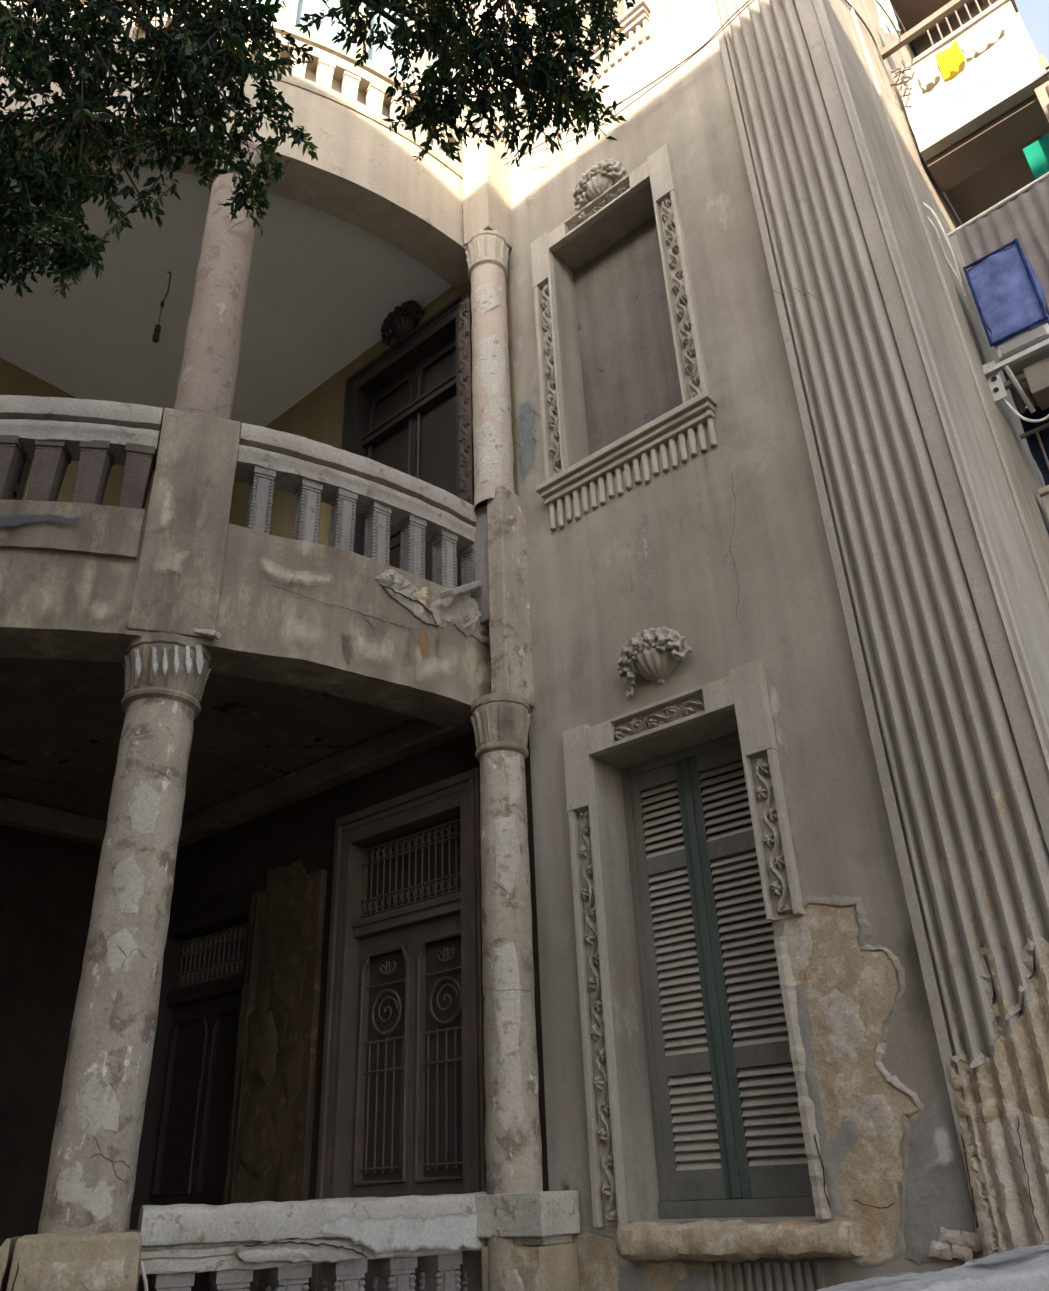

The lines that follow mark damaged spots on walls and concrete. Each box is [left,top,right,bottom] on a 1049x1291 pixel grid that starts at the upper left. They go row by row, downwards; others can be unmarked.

peeling [128,726,182,834]
spalling [994,789,1011,815]
peeling [107,854,146,973]
peeling [76,1075,120,1136]
peeling [773,895,924,1268]
peeling [925,856,1049,1262]
crack [88,1137,131,1183]
peeling [54,1161,115,1228]
peeling [572,1227,738,1291]